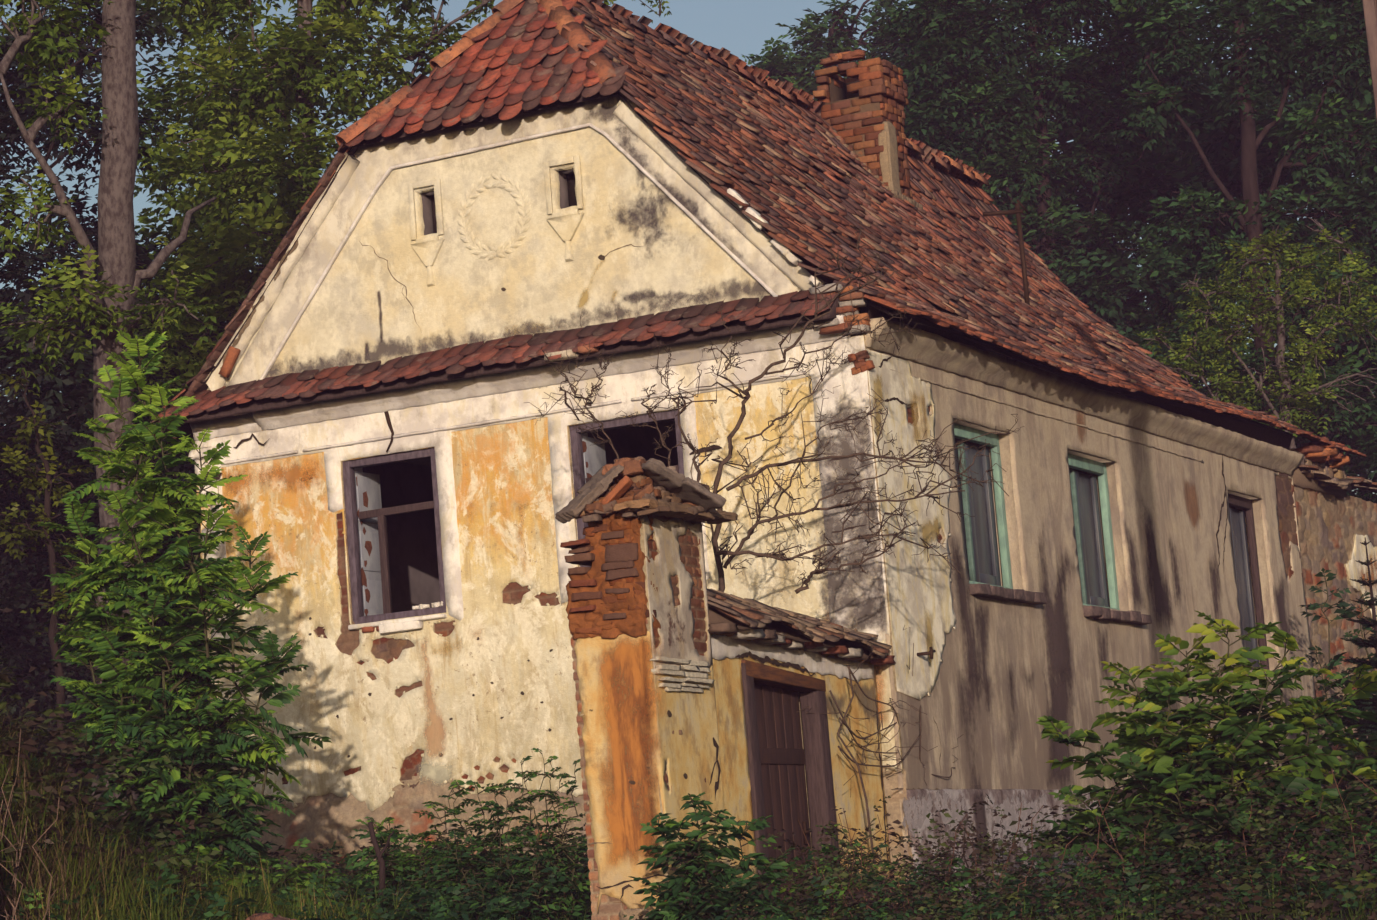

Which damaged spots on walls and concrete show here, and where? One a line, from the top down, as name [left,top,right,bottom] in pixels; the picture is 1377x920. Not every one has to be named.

leakage [589,103,741,256]
crack [359,241,422,333]
crack [206,433,270,480]
spalling [396,679,423,698]
spalling [434,620,456,637]
corrosion [600,638,660,860]
spalling [503,512,874,682]
leakage [815,406,887,631]
peeling [809,283,957,700]
leakage [952,541,990,738]
leakage [1039,546,1072,785]
leakage [1127,517,1180,627]